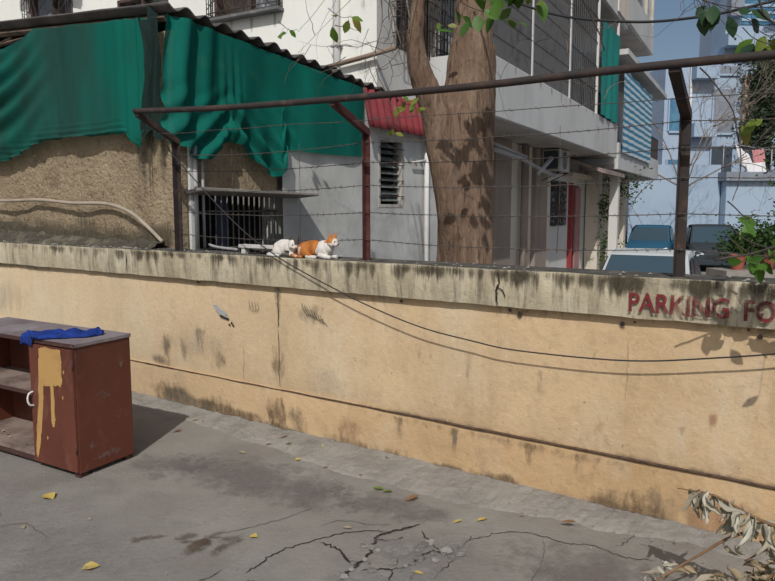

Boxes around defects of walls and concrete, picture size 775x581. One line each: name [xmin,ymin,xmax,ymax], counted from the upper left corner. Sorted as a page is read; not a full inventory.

water stain [116,250,184,262]
crack [495,271,505,306]
water stain [469,269,539,286]
water stain [553,274,643,295]
water stain [691,281,775,300]
water stain [163,388,260,422]
crack [230,507,652,581]